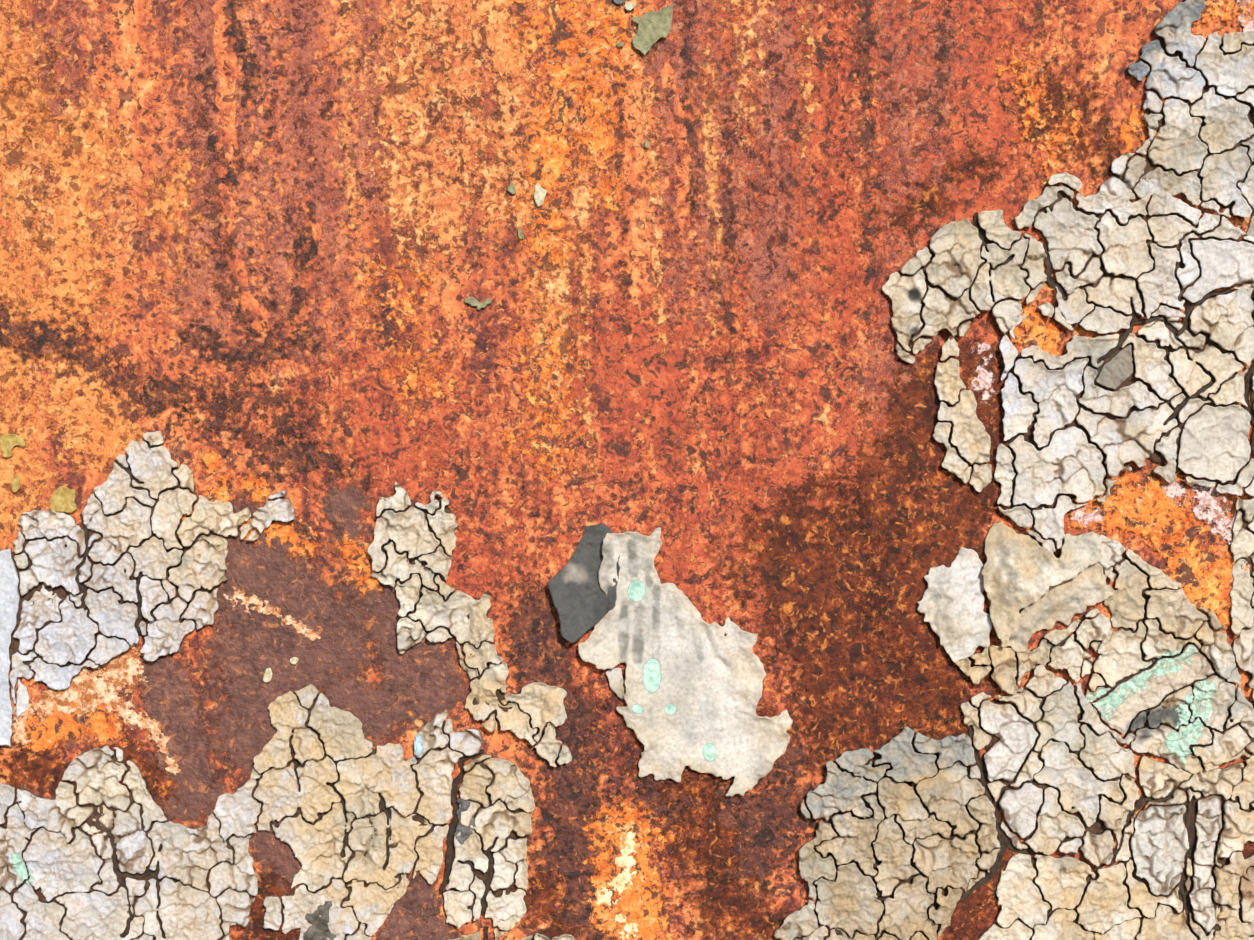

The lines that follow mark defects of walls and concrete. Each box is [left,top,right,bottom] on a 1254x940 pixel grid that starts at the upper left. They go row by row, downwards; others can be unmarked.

crack [1099,287,1232,424]
peeling [0,431,295,747]
peeling [774,0,1254,940]
corrosion [1067,459,1251,641]
peeling [0,482,576,940]
crack [107,830,165,937]
corrosion [231,819,304,940]
corrosion [376,867,458,940]
crack [439,749,498,940]
corrosion [928,830,1015,940]
crack [960,727,1037,901]
crack [1093,795,1199,938]